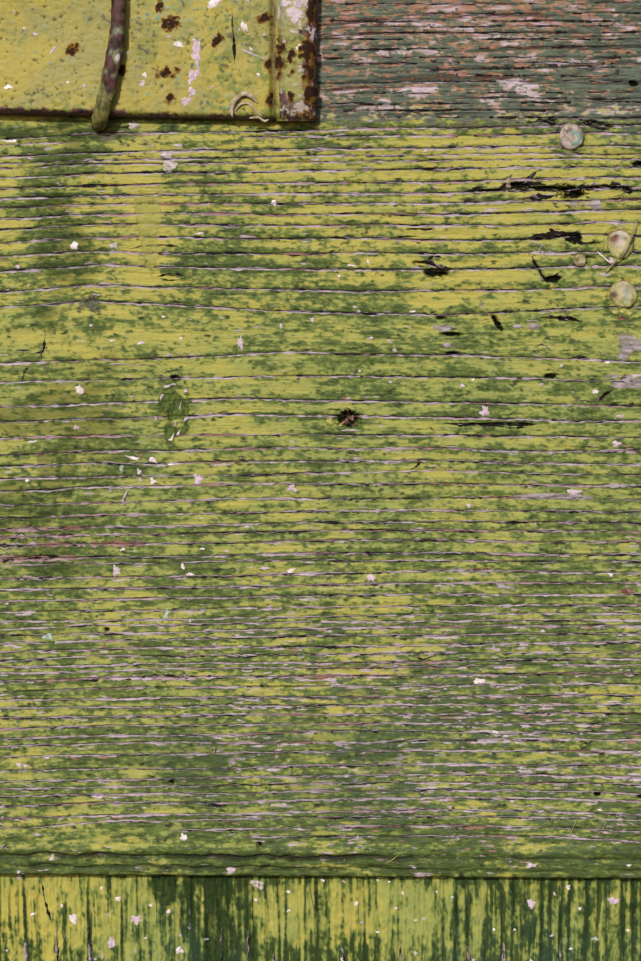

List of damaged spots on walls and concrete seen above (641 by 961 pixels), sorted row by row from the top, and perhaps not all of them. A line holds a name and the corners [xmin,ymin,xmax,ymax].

corrosion [155,0,180,32]
corrosion [256,11,273,24]
corrosion [211,31,225,48]
corrosion [155,65,180,78]
corrosion [264,0,318,118]
crack [0,2,641,322]